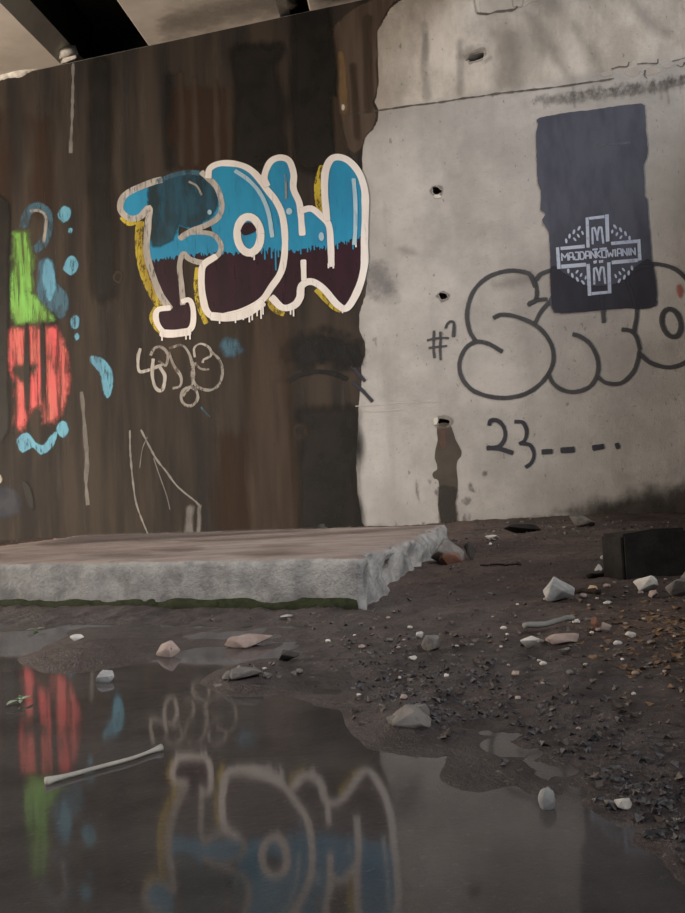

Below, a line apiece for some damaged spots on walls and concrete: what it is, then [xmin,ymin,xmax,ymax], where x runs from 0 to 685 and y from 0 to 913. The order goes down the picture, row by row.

hole [466,48,486,64]
crack [348,58,685,115]
spalling [430,186,443,198]
water stain [0,0,415,541]
water stain [432,423,461,523]
water stain [571,487,685,514]